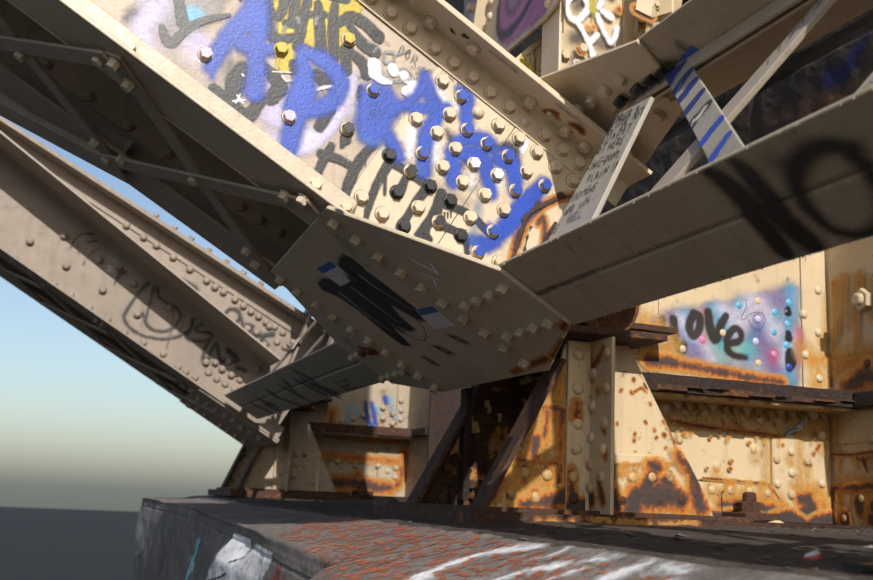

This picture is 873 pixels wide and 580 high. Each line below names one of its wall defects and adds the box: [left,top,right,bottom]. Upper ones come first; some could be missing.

rust [320,435,408,496]
rust [490,269,873,527]